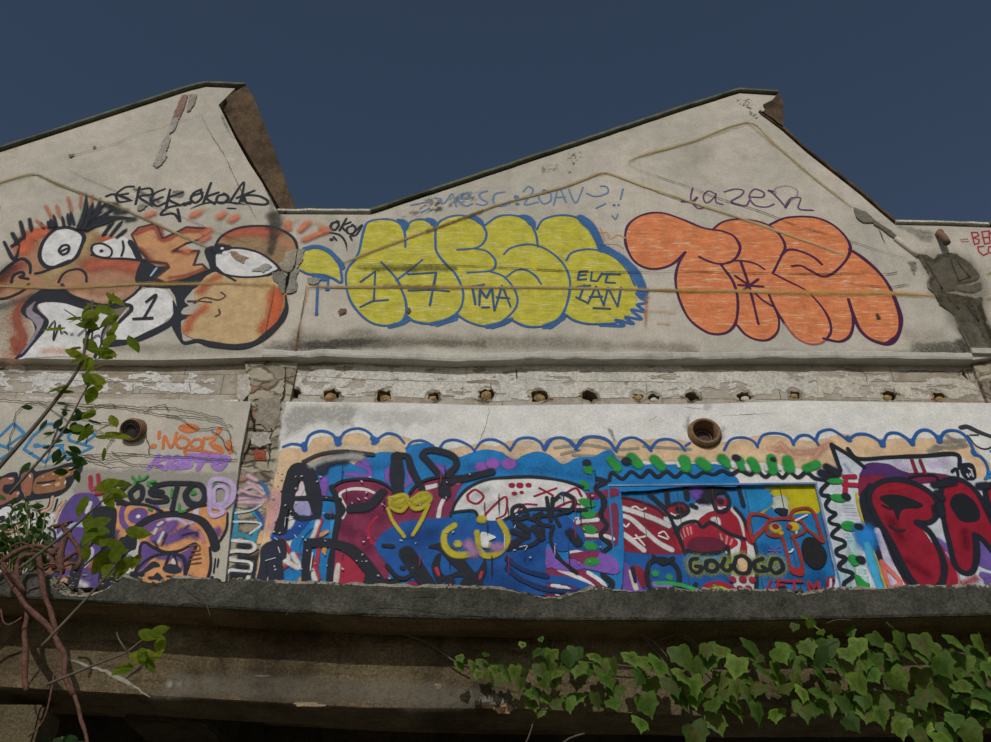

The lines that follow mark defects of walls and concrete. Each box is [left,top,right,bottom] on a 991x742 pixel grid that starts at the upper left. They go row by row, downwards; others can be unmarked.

spalling [918,253,991,352]
crack [79,454,147,468]
crack [13,365,244,465]
peeling [0,362,991,511]
spalling [50,574,174,598]